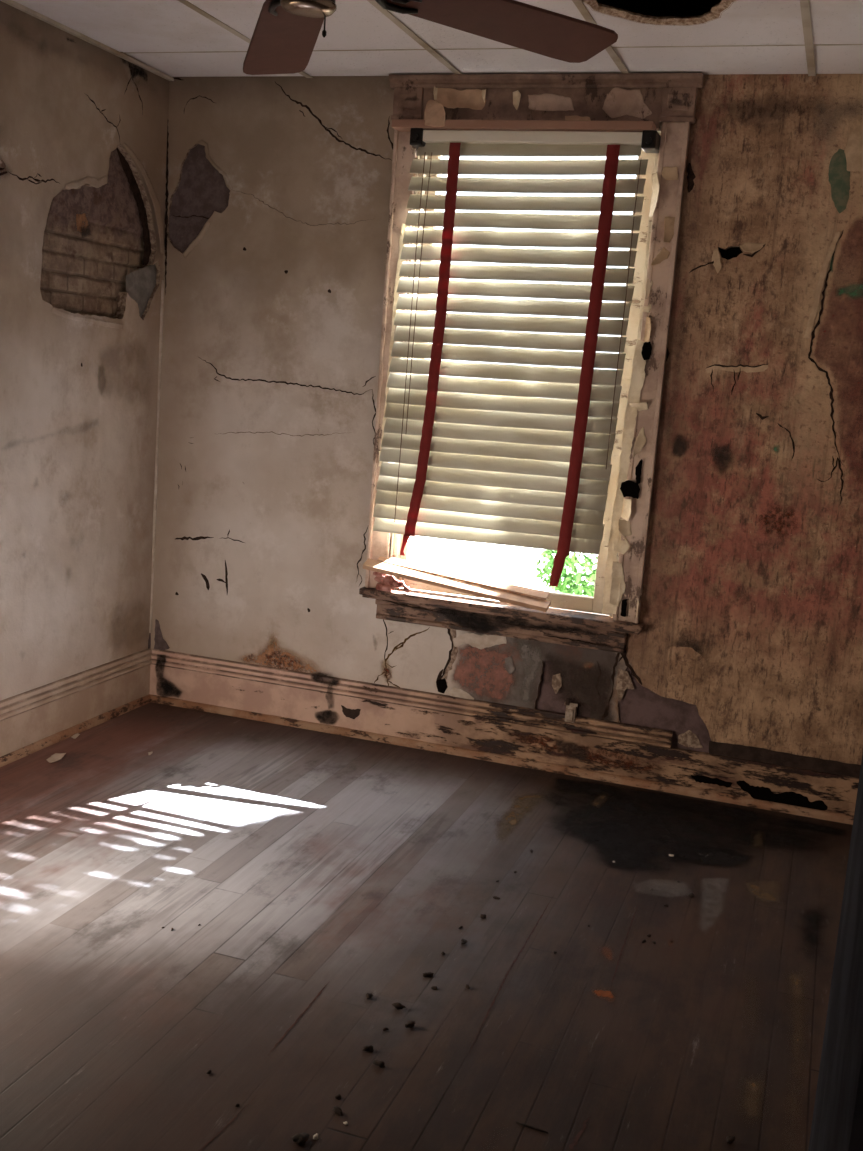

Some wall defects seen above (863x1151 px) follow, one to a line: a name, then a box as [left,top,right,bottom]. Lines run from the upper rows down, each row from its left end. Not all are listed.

peeling [424,86,486,127]
flaking render [40,140,233,329]
crack [196,357,376,444]
peeling [602,167,678,618]
crack [817,456,844,504]
crack [175,529,245,543]
crack [356,525,369,586]
leakage [242,640,338,724]
crack [374,600,458,693]
peeling [448,633,590,718]
leakage [546,778,845,872]
peeling [691,775,828,811]